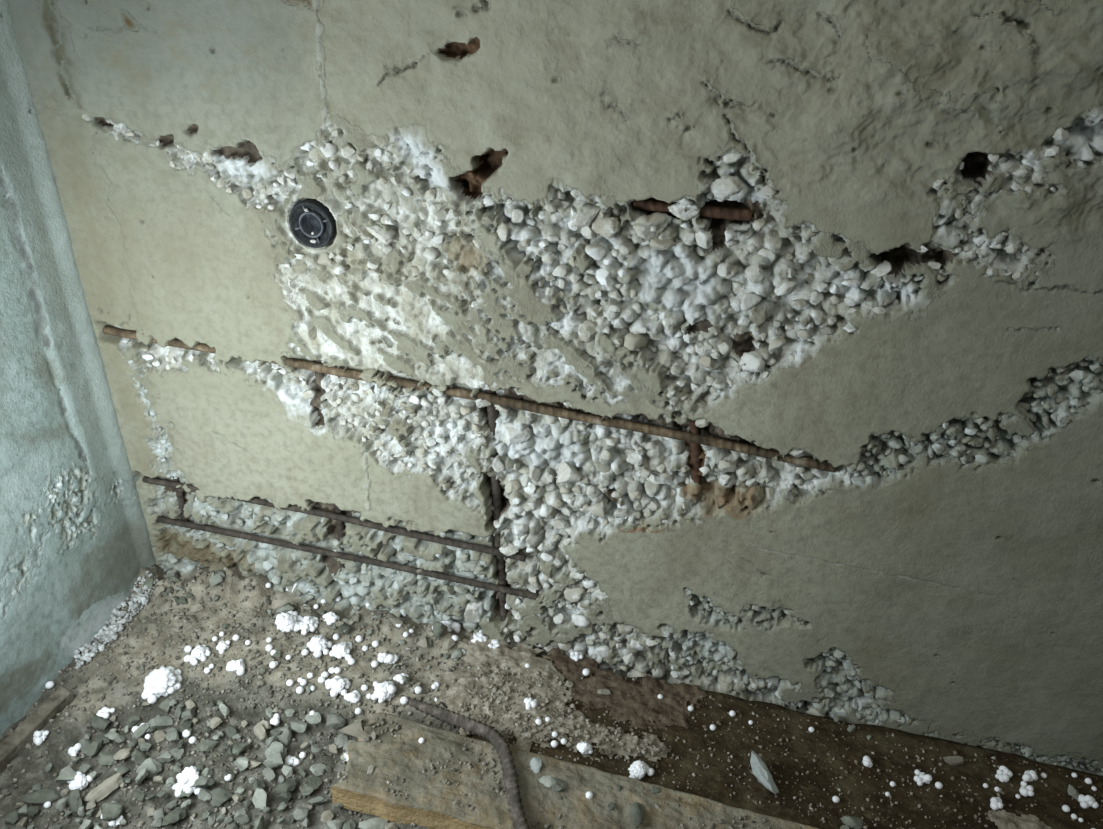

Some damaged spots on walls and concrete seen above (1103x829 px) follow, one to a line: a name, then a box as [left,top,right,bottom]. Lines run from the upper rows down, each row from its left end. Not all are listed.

crack [377,54,430,86]
crack [454,0,490,13]
crack [728,0,842,83]
spalling [82,115,142,137]
flaking render [156,128,481,276]
crack [702,80,769,197]
spalling [955,127,1069,224]
flaking render [128,346,219,388]
flaking render [245,149,1103,701]
flaking render [154,428,253,548]
corrosion [148,527,256,576]
flaking render [805,651,880,726]